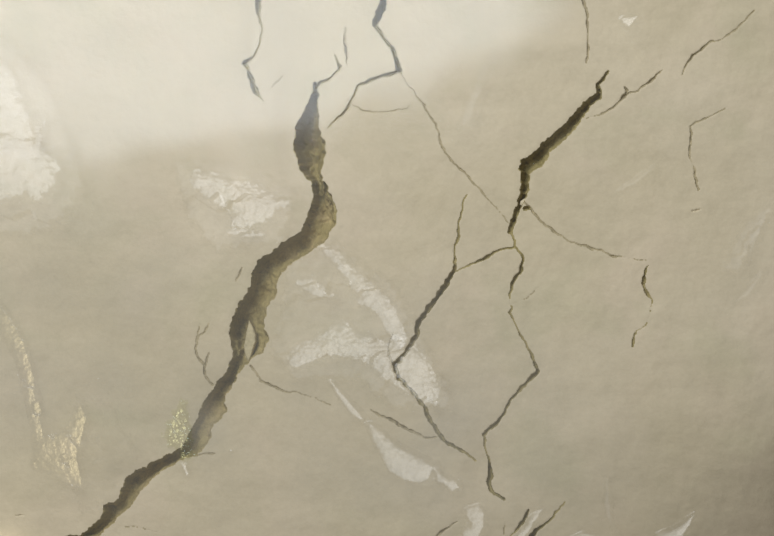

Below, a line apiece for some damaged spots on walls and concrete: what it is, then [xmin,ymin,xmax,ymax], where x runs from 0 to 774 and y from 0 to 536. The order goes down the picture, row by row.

crack [682,10,755,75]
crack [688,108,726,191]
crack [68,0,662,536]